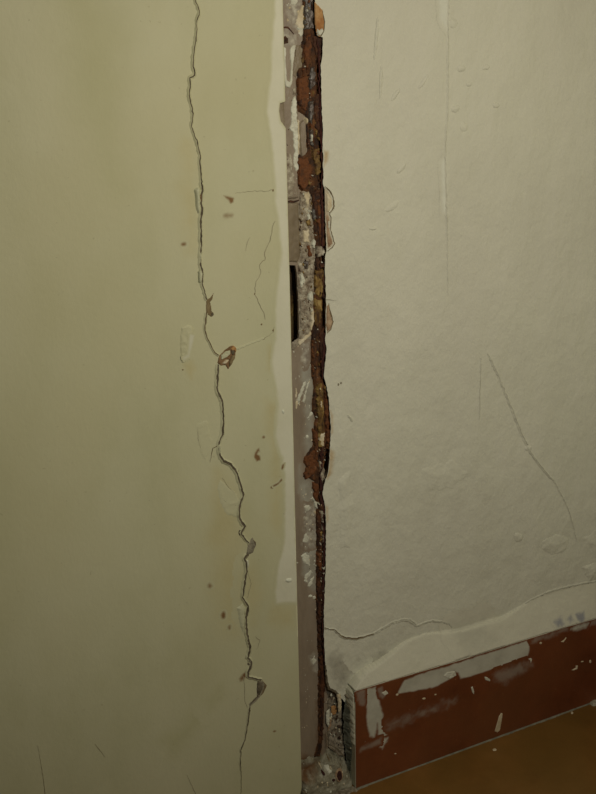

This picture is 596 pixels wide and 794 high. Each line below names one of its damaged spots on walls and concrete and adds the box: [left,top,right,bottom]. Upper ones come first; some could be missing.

crack [186,0,275,794]
peeling [283,0,336,599]
corrosion [296,0,330,791]
spalling [306,649,345,756]
spalling [325,408,338,482]
crack [324,618,452,641]